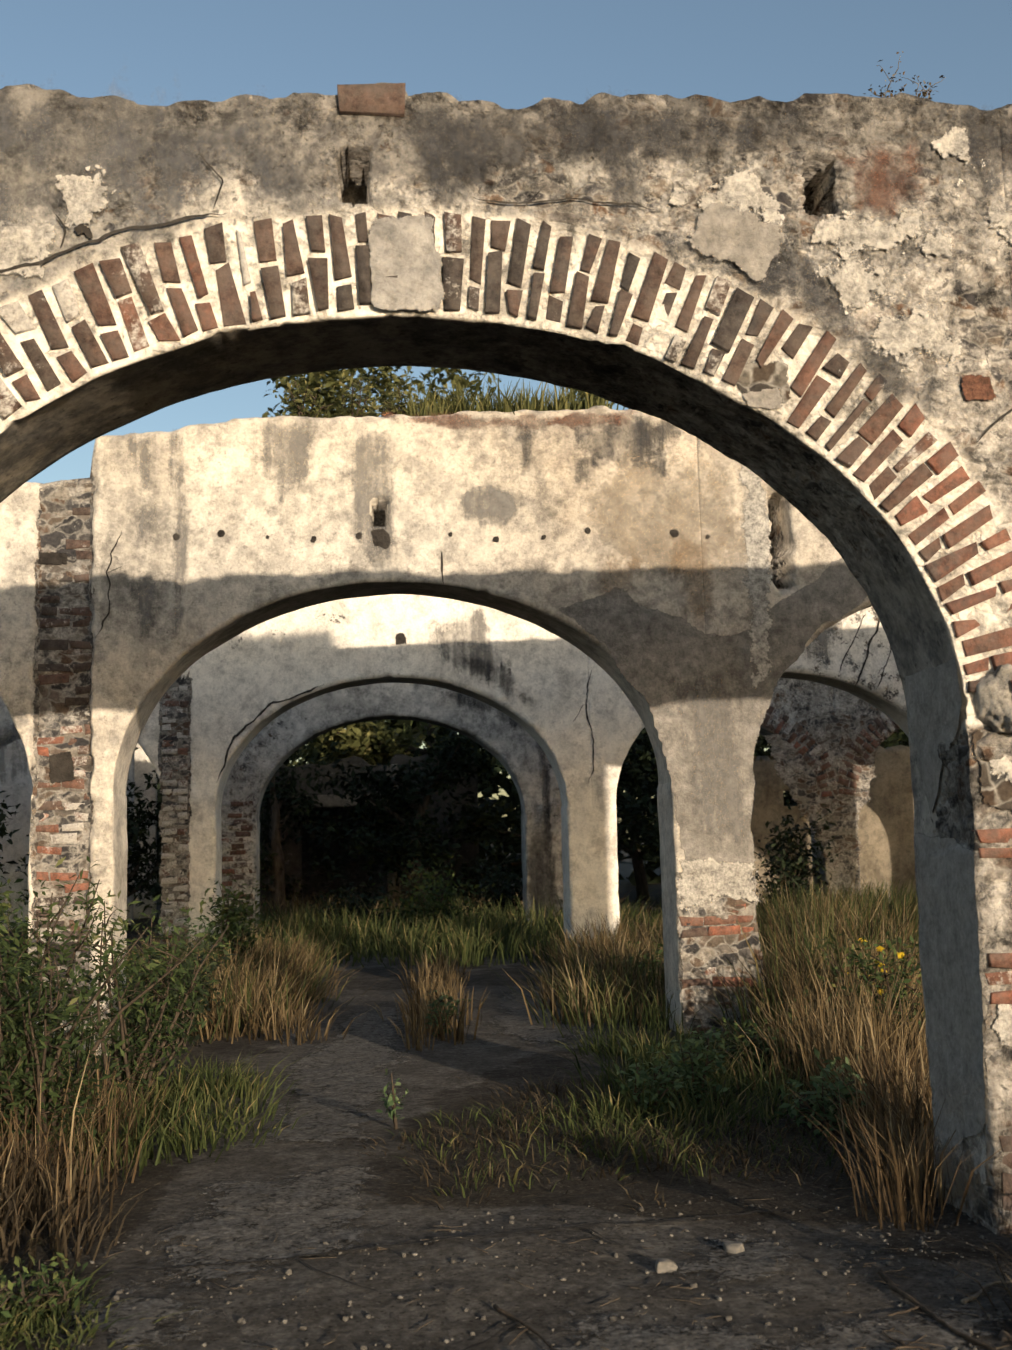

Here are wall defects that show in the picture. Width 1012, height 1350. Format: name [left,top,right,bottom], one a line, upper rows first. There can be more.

flaking render [0,164,122,279]
crack [0,153,226,273]
water stain [419,109,504,203]
flaking render [669,169,785,241]
flaking render [808,151,968,378]
flaking render [931,126,1003,197]
flaking render [961,374,996,401]
crack [977,409,1012,442]
crack [97,531,122,635]
water stain [435,610,530,702]
flaking render [915,833,1012,1185]